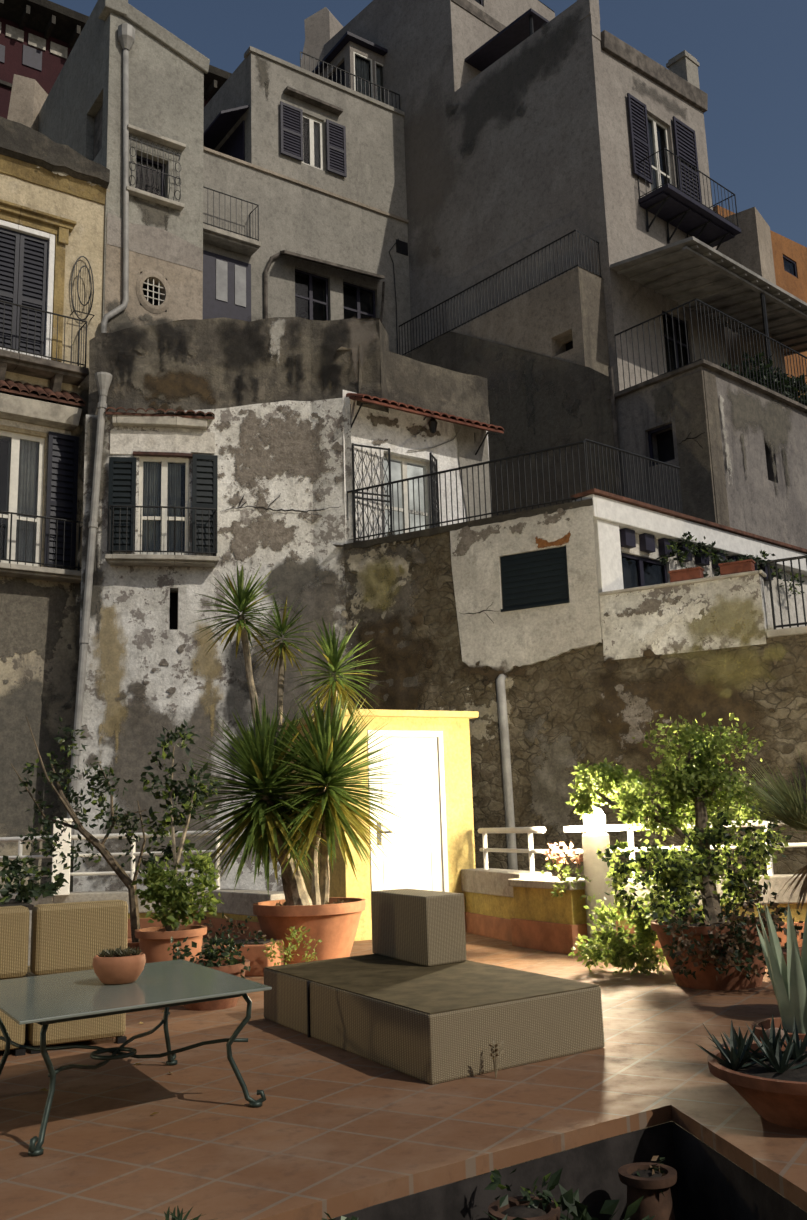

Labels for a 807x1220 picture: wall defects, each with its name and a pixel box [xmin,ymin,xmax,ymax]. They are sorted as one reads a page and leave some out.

leakage [404,17,576,218]
leakage [107,301,187,386]
leakage [222,319,376,406]
flaking render [216,405,344,566]
crack [220,493,341,512]
flaking render [449,507,572,556]
peeling [0,577,71,662]
peeling [250,532,426,726]
flaking render [604,591,708,645]
peeling [0,680,71,837]
peeling [84,644,231,887]